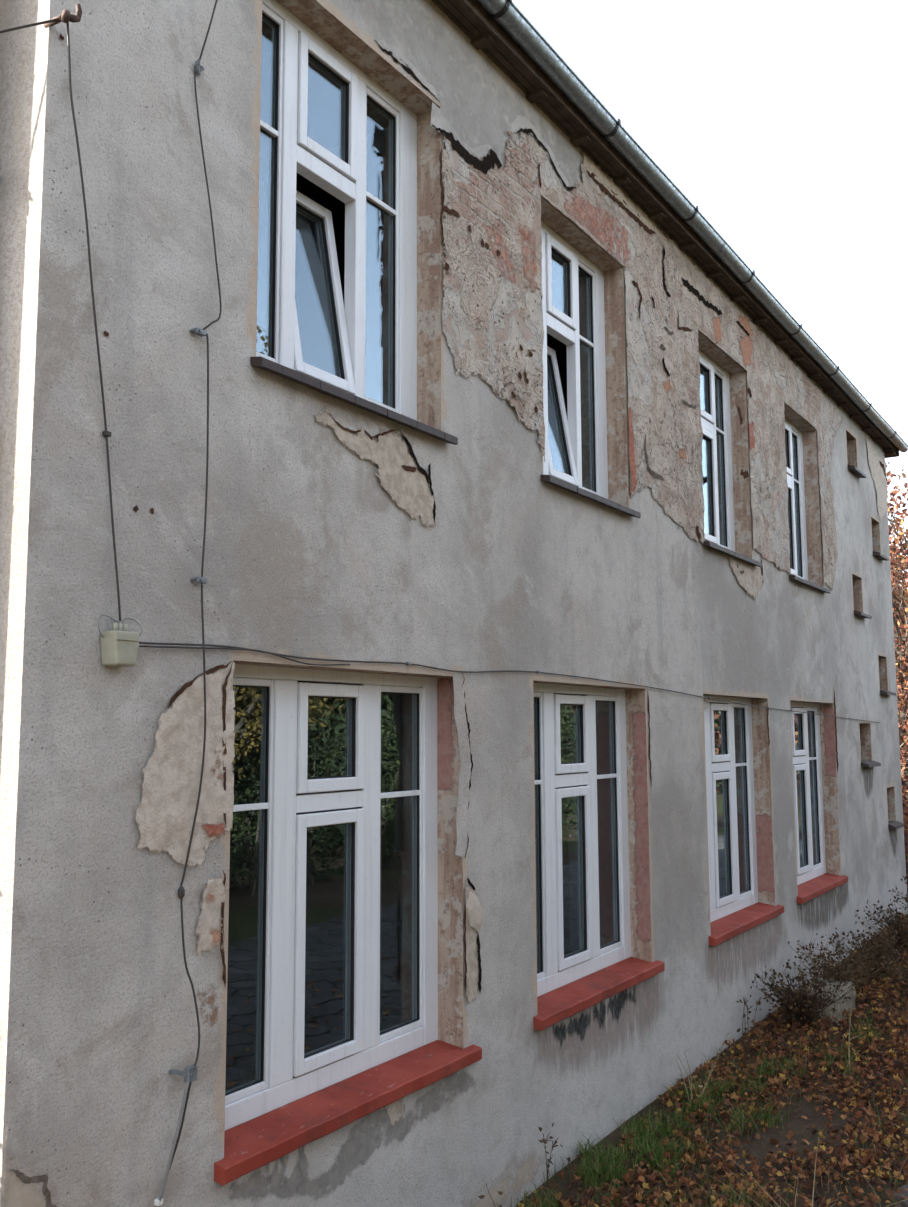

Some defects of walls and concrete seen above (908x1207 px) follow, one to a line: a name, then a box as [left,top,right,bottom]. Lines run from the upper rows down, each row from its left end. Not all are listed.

flaking render [316,398,444,527]
flaking render [439,128,843,599]
flaking render [135,644,235,867]
flaking render [196,870,226,985]